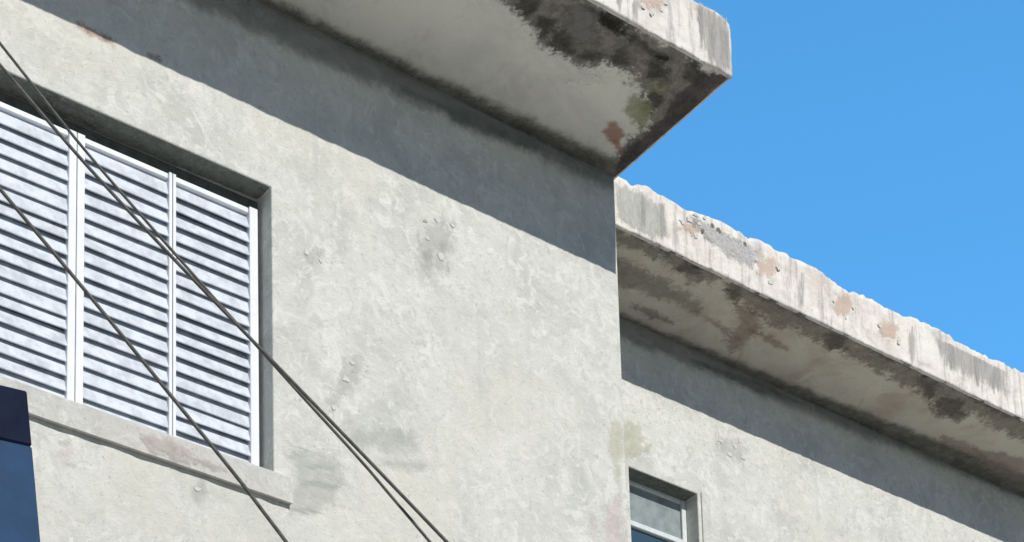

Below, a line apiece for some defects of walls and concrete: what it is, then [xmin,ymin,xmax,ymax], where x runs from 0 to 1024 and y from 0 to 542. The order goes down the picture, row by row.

rust [602,123,624,152]
water stain [256,0,1024,440]
spalling [679,213,782,284]
peeling [833,295,855,319]
peeling [878,320,901,345]
water stain [619,316,1024,501]